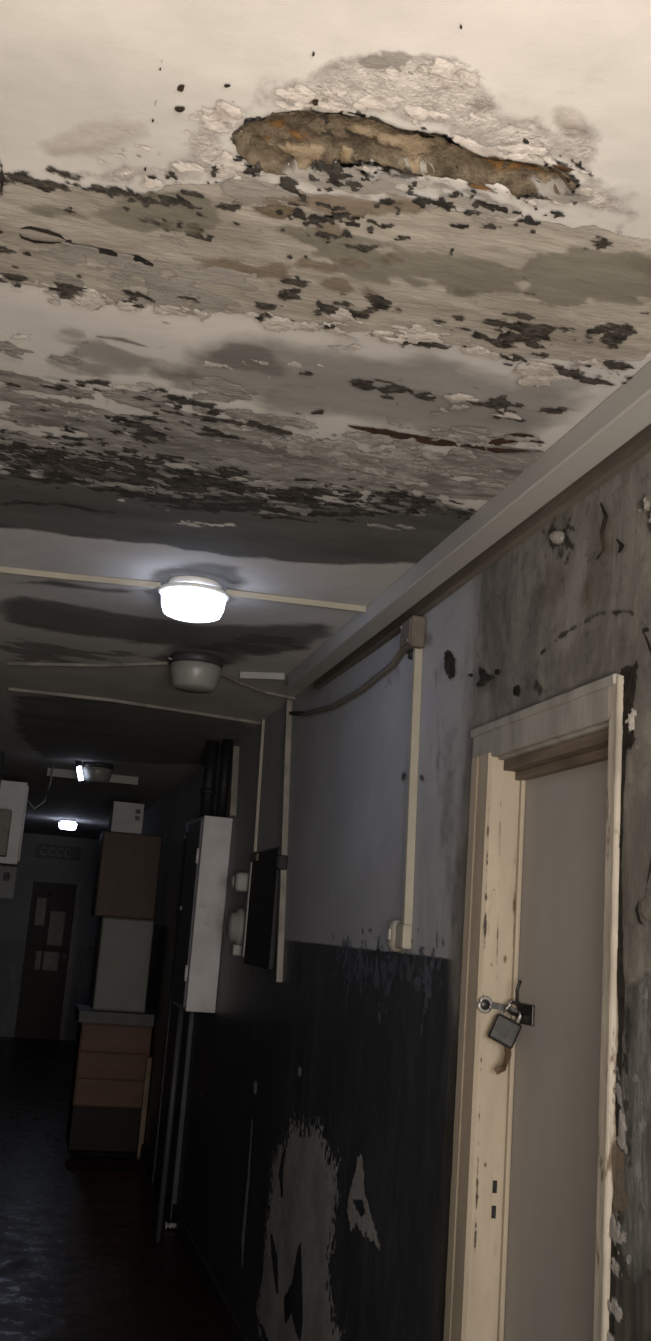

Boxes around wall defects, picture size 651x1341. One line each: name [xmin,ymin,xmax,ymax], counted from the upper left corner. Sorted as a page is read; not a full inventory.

peeling [0,99,651,388]
water stain [583,232,651,265]
water stain [186,312,648,433]
water stain [43,581,87,589]
water stain [8,599,324,654]
water stain [0,379,476,565]
peeling [0,341,544,535]
spalling [543,518,574,564]
peeling [639,497,651,532]
peeling [241,1119,253,1267]
peeling [255,1103,380,1341]